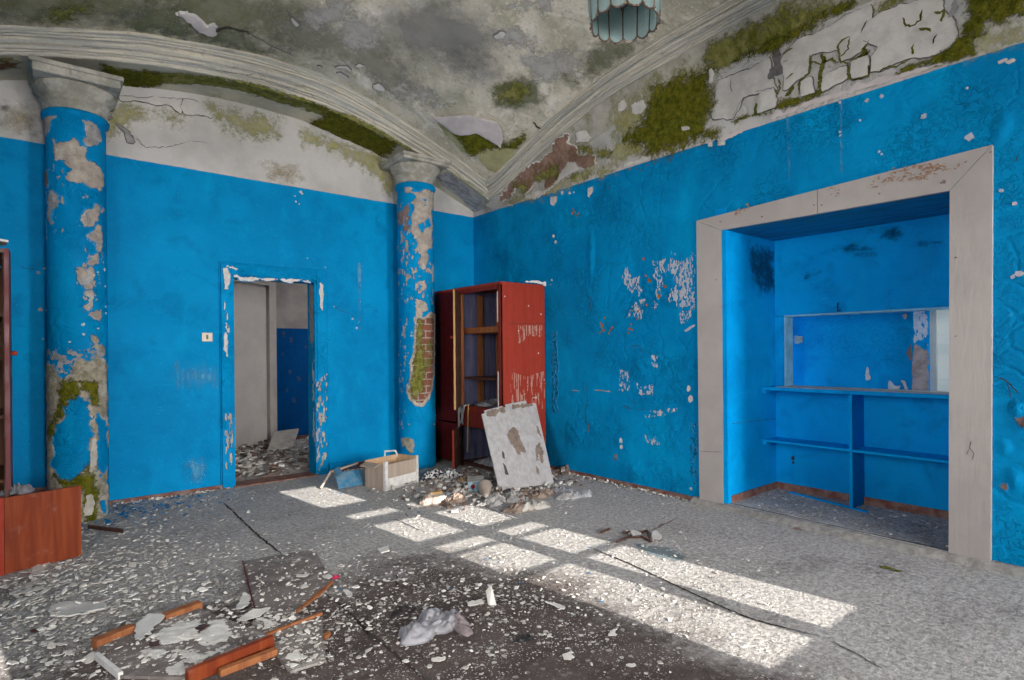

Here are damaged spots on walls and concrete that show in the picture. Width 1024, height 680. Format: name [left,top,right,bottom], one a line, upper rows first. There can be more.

flaking render [42,115,135,522]